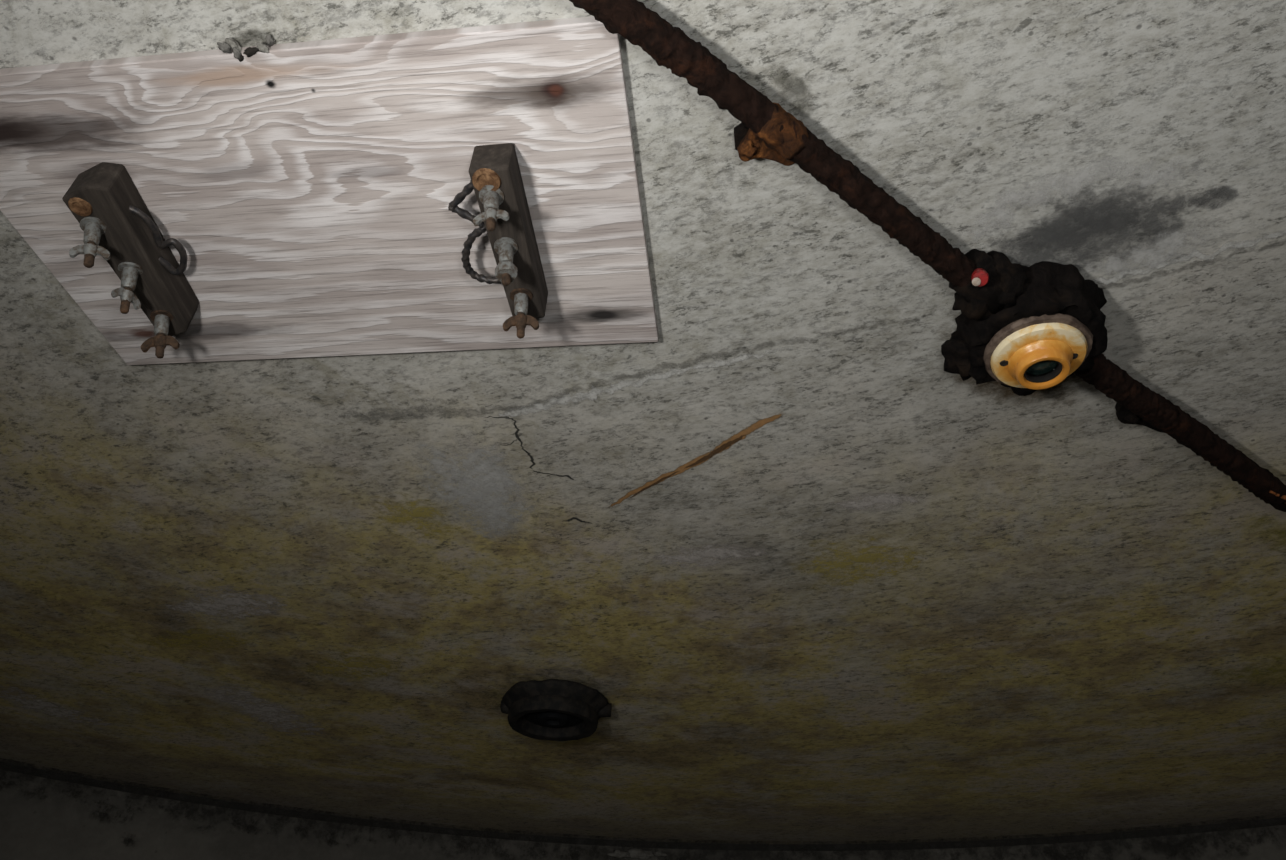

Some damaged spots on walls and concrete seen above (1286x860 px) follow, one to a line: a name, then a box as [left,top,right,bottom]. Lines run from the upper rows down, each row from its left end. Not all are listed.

leakage [976,159,1237,273]
crack [1093,231,1286,285]
crack [485,350,779,480]
corrosion [611,414,781,506]
corrosion [958,373,1076,402]
leakage [0,759,1278,860]